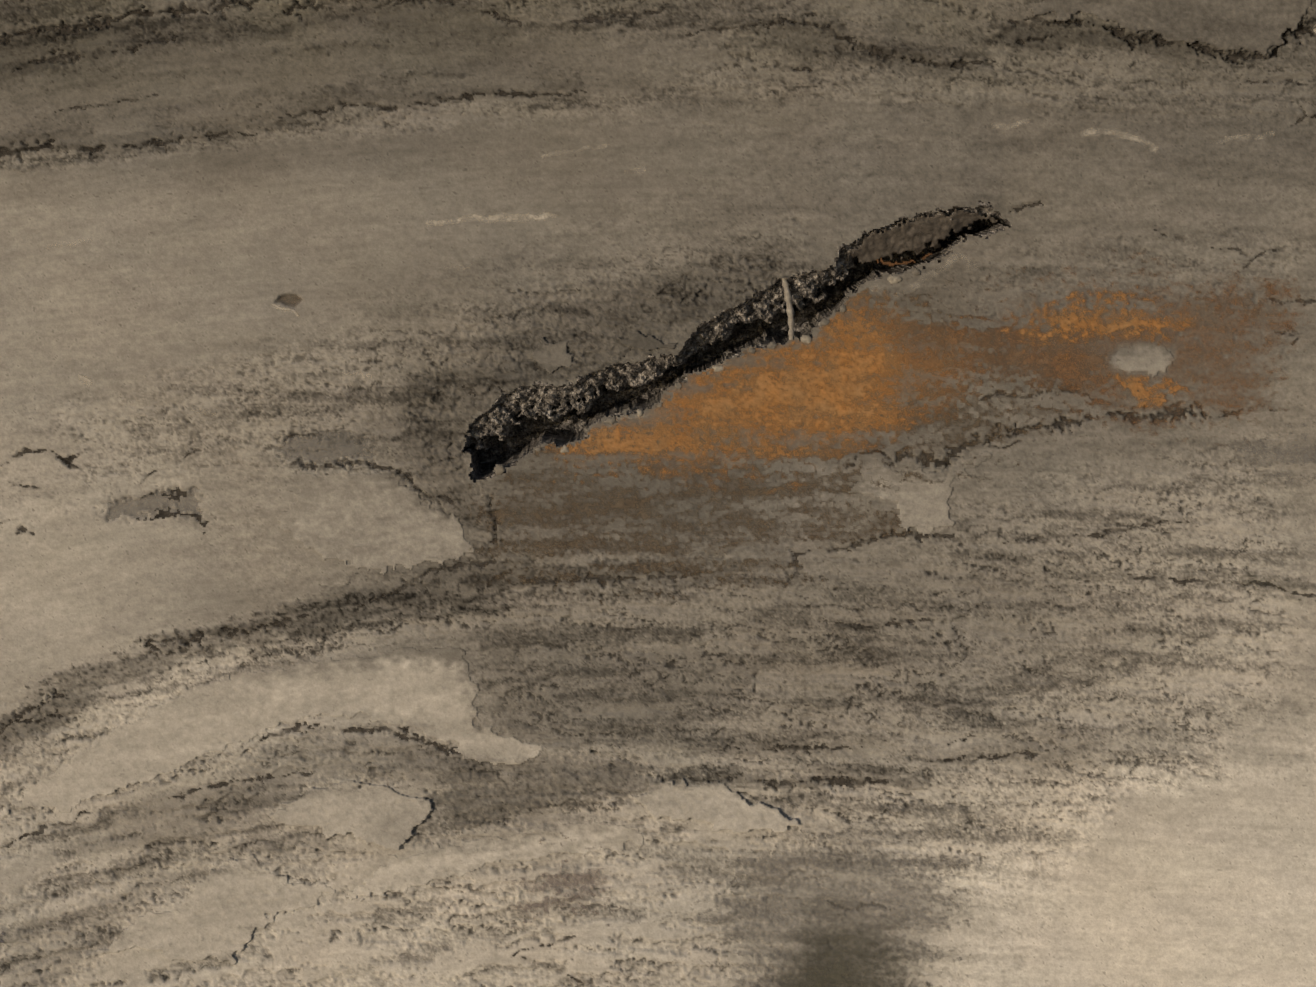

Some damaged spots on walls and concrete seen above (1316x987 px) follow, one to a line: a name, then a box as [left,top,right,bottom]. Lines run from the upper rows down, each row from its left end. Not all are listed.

crack [0,0,319,71]
crack [400,0,522,26]
crack [571,7,666,24]
crack [686,13,1316,123]
crack [0,90,587,159]
peeling [532,337,576,374]
rust [562,279,1296,474]
spalling [110,487,208,534]
peeling [276,468,479,575]
peeling [7,646,543,815]
peeling [634,778,800,833]
peeling [84,780,644,965]